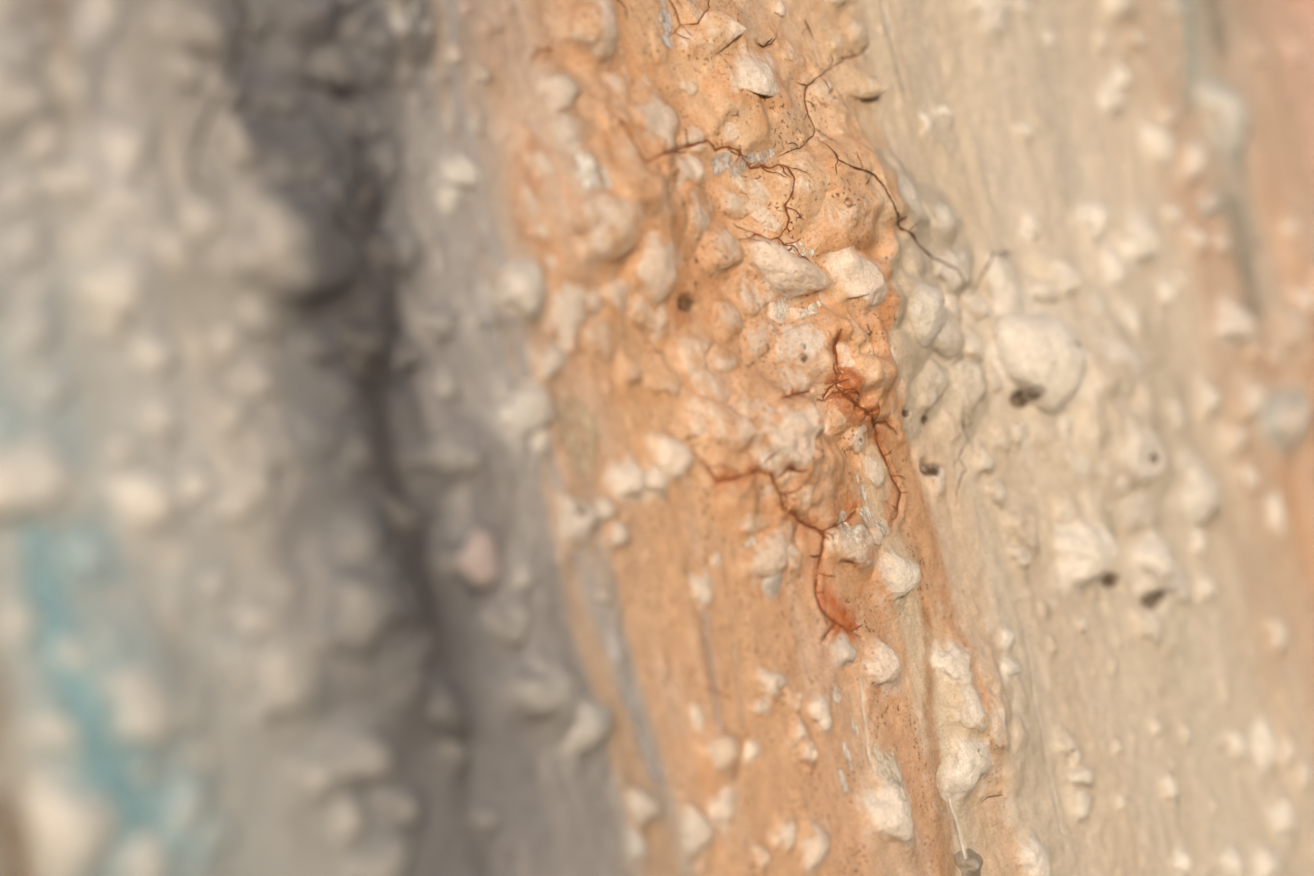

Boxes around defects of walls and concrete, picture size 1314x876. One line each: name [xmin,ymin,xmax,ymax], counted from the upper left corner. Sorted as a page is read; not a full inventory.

crack [611,21,1014,296]
crack [781,330,907,527]
crack [694,450,863,640]